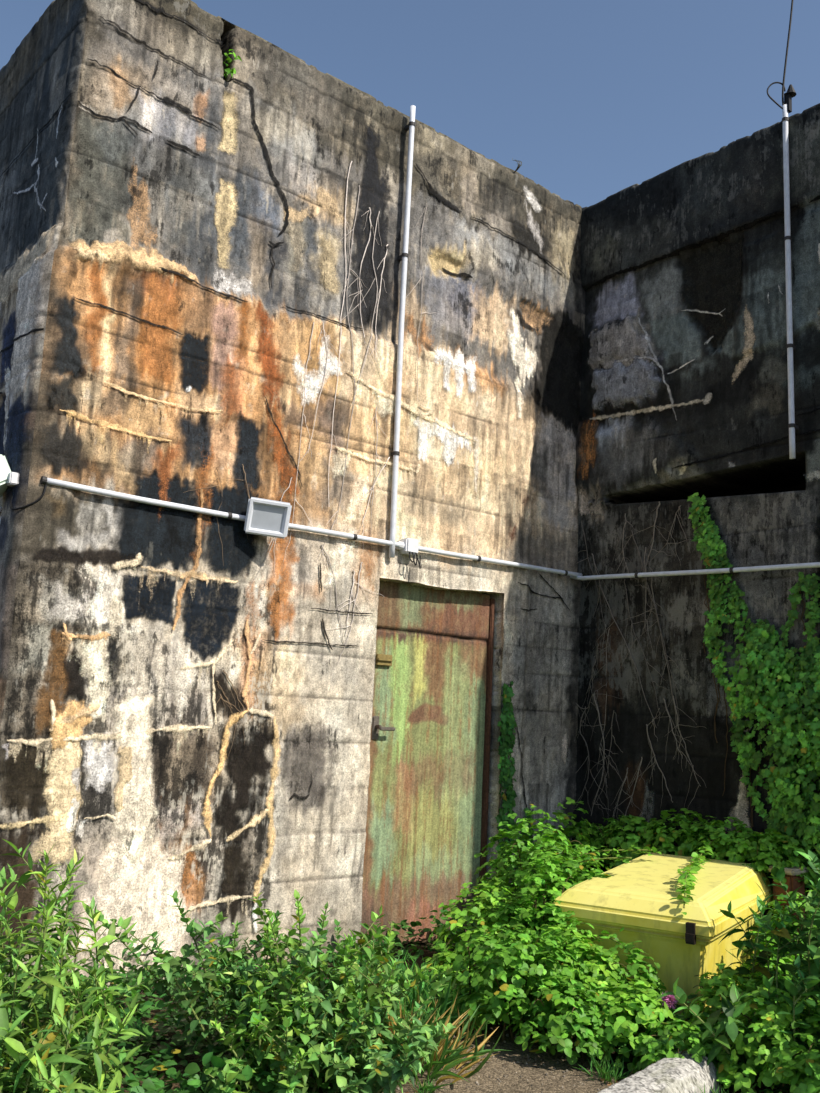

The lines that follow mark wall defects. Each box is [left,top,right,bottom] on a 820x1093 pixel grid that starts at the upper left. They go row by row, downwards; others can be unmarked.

leakage [0,252,46,504]
leakage [48,299,82,413]
corrosion [87,269,108,369]
corrosion [141,274,178,379]
crack [0,0,366,335]
corrosion [221,301,298,522]
leakage [351,126,393,331]
leakage [0,415,259,950]
crack [0,562,372,933]
leakage [215,728,273,923]
corrosion [246,536,299,637]